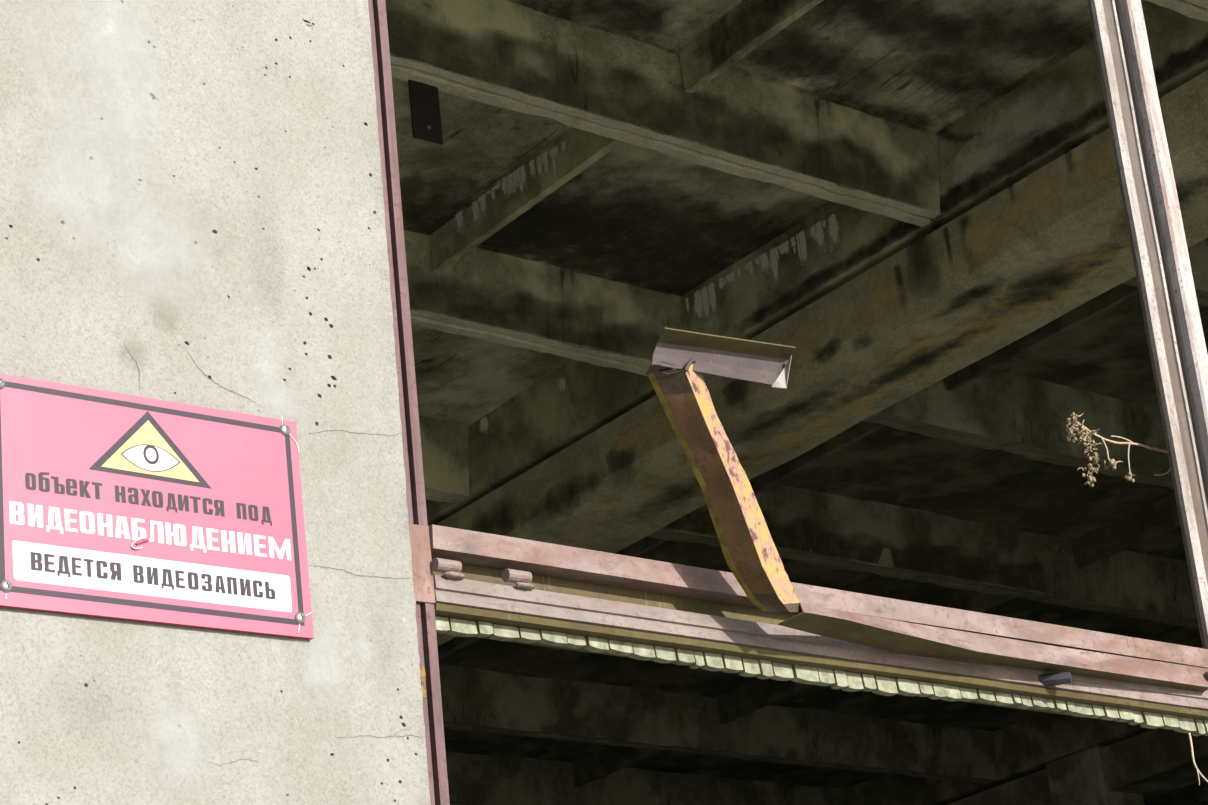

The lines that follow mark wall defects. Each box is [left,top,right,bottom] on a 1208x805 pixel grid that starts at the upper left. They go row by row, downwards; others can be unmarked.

water stain [808,0,1091,97]
water stain [1154,40,1208,85]
water stain [386,0,929,205]
water stain [401,141,839,318]
water stain [940,103,1107,211]
water stain [1177,184,1208,204]
water stain [743,222,930,330]
crack [187,351,260,406]
crack [309,565,411,579]
water stain [481,504,512,534]
water stain [665,511,717,536]
water stain [762,512,1046,591]